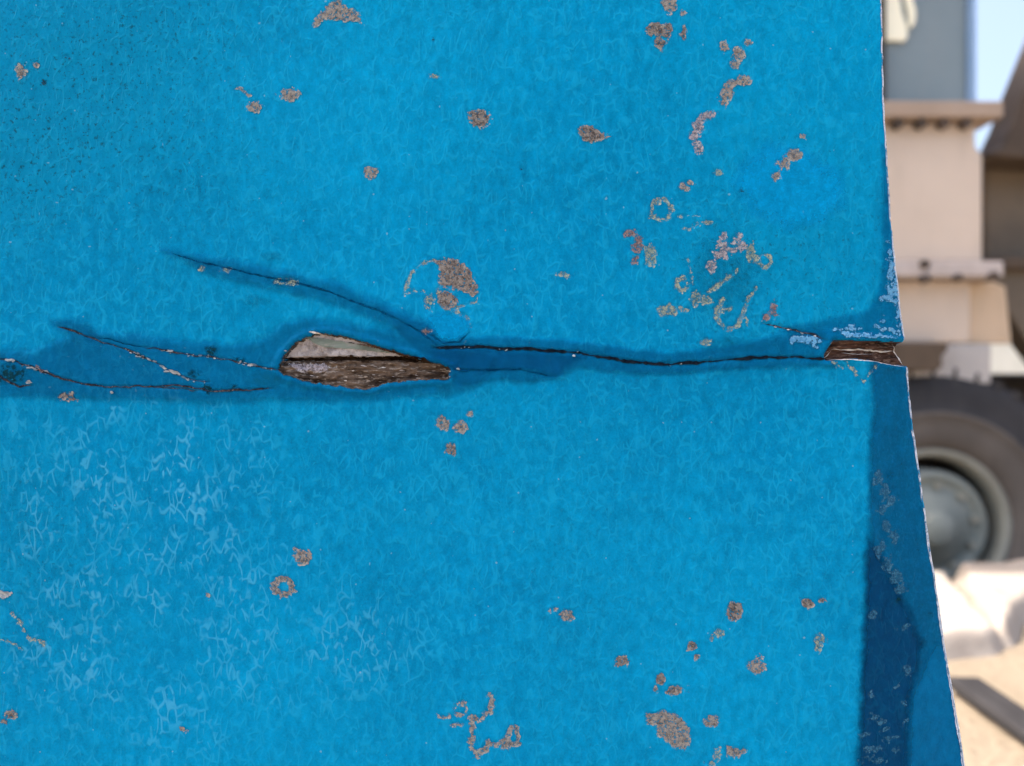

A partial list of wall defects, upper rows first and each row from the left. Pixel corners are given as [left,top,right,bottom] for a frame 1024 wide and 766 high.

peeling [313,0,362,28]
peeling [645,0,687,51]
peeling [689,39,753,154]
peeling [404,257,478,319]
crack [175,254,825,376]
peeling [658,232,773,331]
crack [0,327,278,394]
spalling [278,331,450,390]
spalling [824,340,903,382]
peeling [436,411,473,456]
peeling [437,692,521,759]
peeling [645,710,691,749]